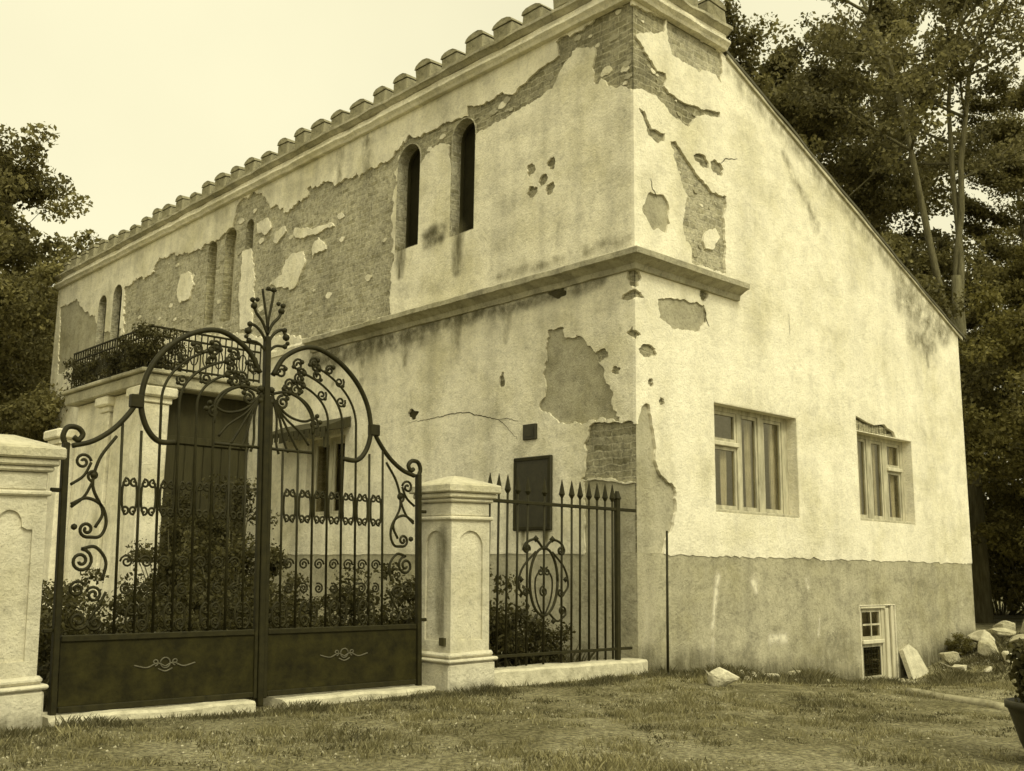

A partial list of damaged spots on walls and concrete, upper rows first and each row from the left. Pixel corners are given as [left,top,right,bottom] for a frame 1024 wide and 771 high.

flaking render [58,3,725,374]
crack [409,412,517,438]
flaking render [540,327,674,553]